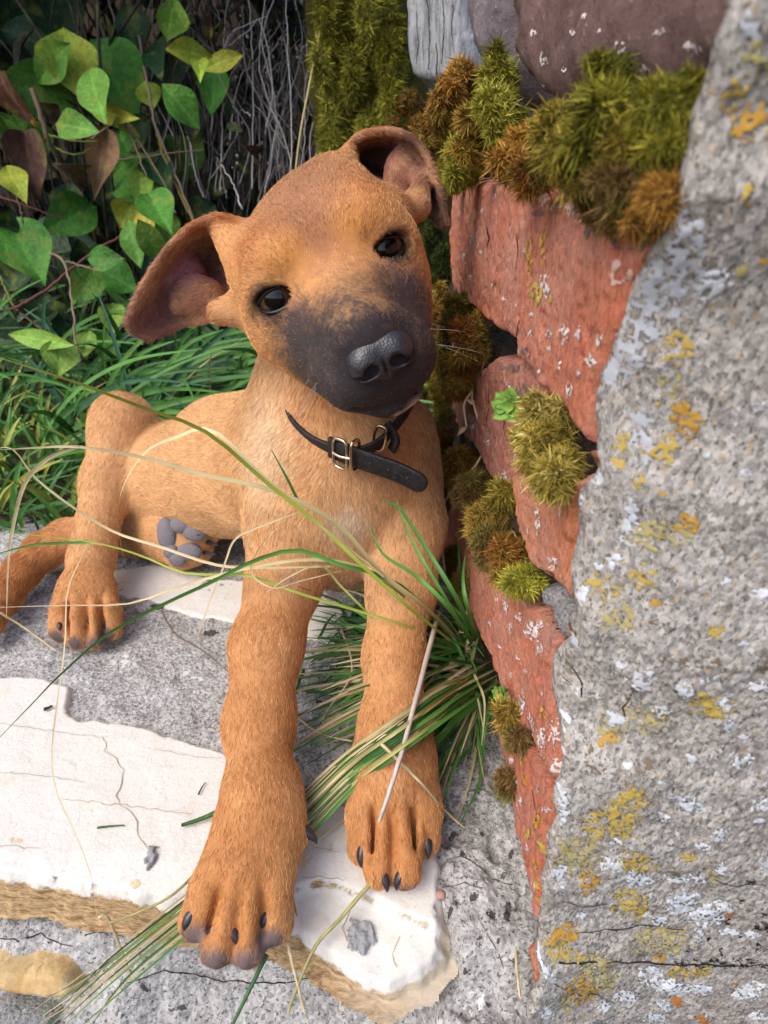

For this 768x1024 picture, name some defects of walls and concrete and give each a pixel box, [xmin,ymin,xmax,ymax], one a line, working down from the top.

crack [0,723,191,848]
crack [123,969,307,984]